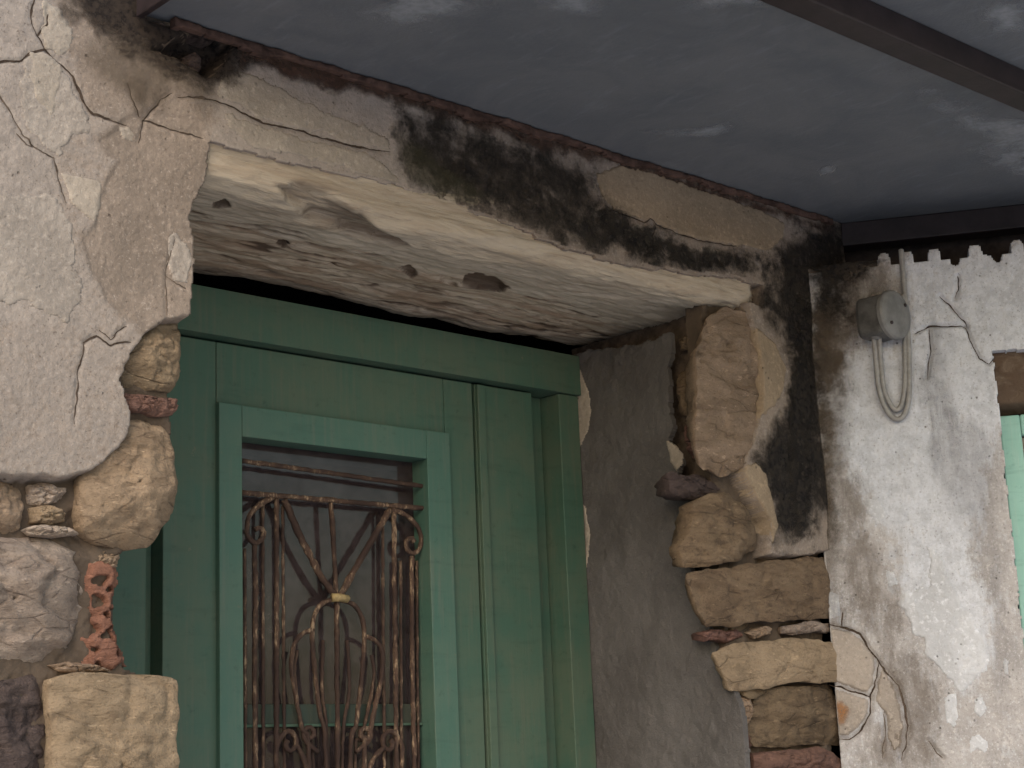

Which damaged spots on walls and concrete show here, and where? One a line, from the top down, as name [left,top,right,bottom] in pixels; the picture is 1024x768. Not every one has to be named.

crack [0,96,67,204]
water stain [71,0,258,87]
crack [0,0,390,152]
crack [74,326,131,424]
crack [165,240,186,315]
water stain [391,104,880,541]
crack [915,276,996,378]
spalling [0,323,181,768]
spalling [654,306,841,768]
crack [828,612,943,760]
peeling [886,546,989,727]
peeling [970,735,988,753]